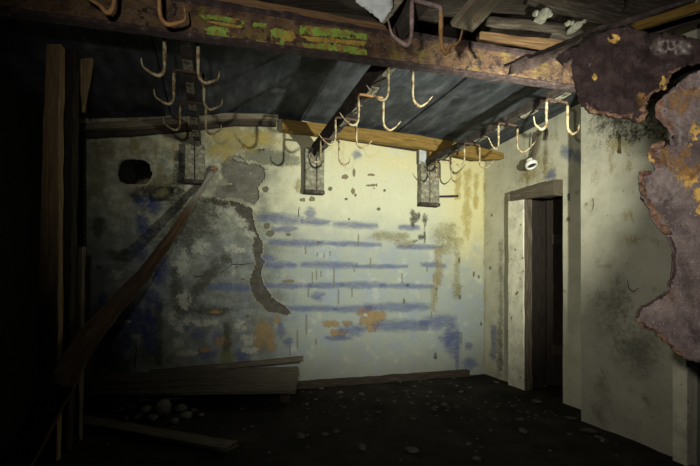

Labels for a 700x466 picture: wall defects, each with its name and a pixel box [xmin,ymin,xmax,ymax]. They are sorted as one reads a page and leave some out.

spalling [115,156,154,188]
flaking render [213,156,291,316]